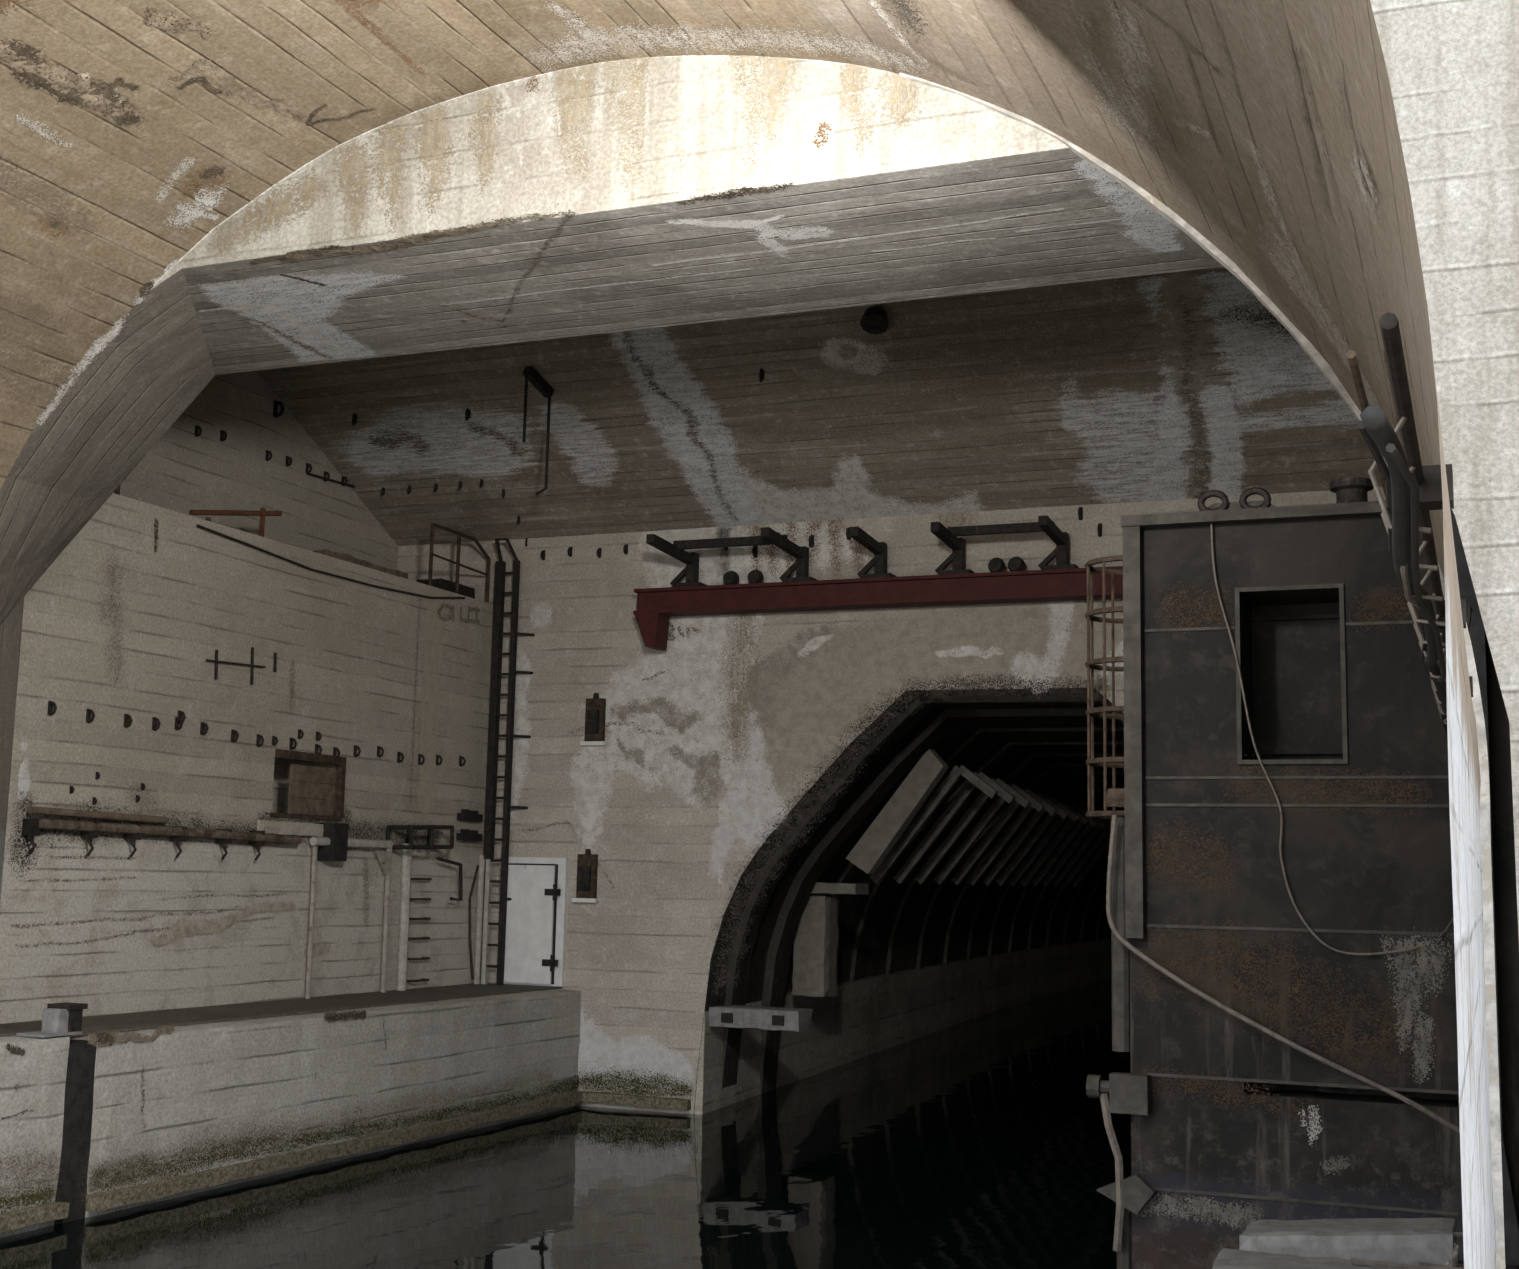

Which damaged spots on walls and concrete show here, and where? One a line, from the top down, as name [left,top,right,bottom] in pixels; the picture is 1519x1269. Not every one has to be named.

damp [163,89,503,260]
damp [522,0,977,192]
damp [605,270,1358,527]
rust [1136,1064,1318,1124]
rust [1128,1192,1265,1230]